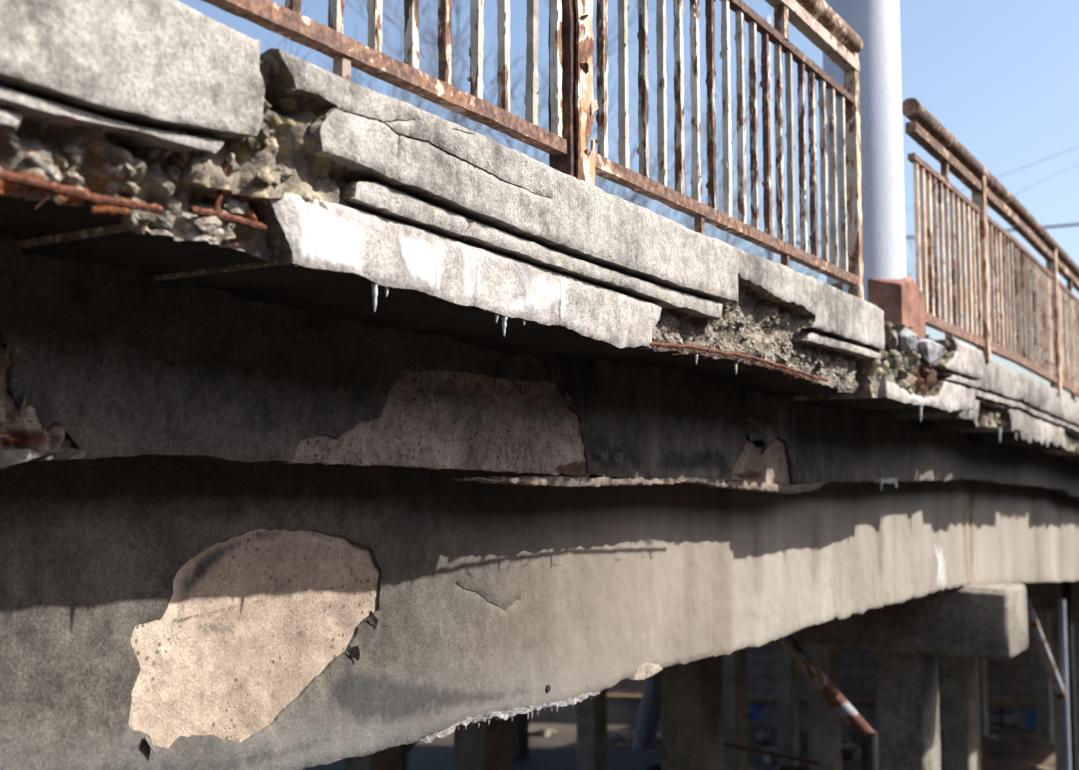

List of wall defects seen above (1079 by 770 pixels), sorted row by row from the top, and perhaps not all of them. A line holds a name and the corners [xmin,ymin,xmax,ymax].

rust [0,169,139,214]
spalling [0,60,397,276]
rust [220,196,268,227]
crack [332,106,522,188]
peeling [0,341,86,469]
peeling [276,369,828,494]
spalling [551,285,966,414]
spalling [955,399,1012,433]
peeling [129,529,379,754]